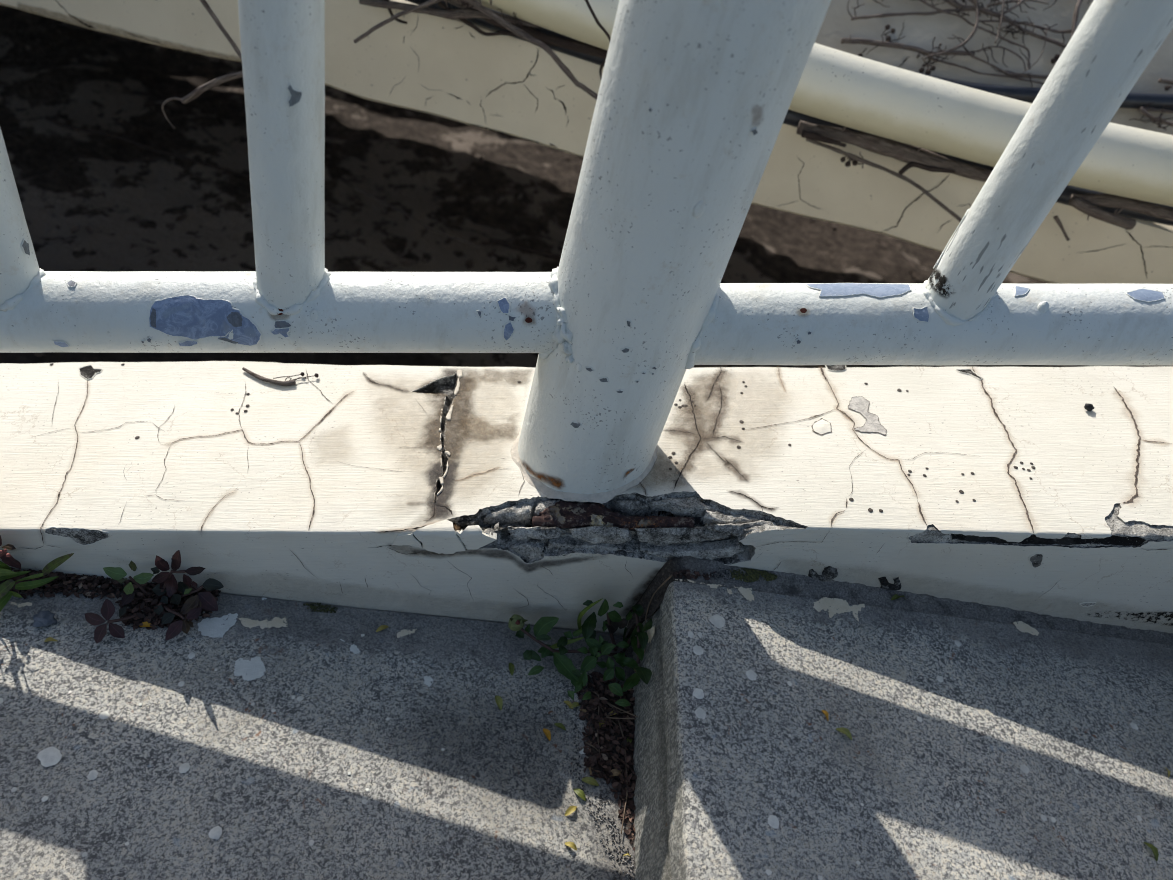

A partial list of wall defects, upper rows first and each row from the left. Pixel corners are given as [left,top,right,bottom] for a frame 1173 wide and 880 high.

peeling [141,295,292,347]
peeling [805,283,912,298]
crack [17,371,427,593]
corrosion [523,464,563,488]
crack [670,367,975,543]
peeling [848,396,887,435]
crack [971,365,1034,535]
crack [1113,386,1172,503]
peeling [44,527,110,546]
crack [372,458,524,601]
spalling [453,494,800,562]
spalling [909,505,1173,568]